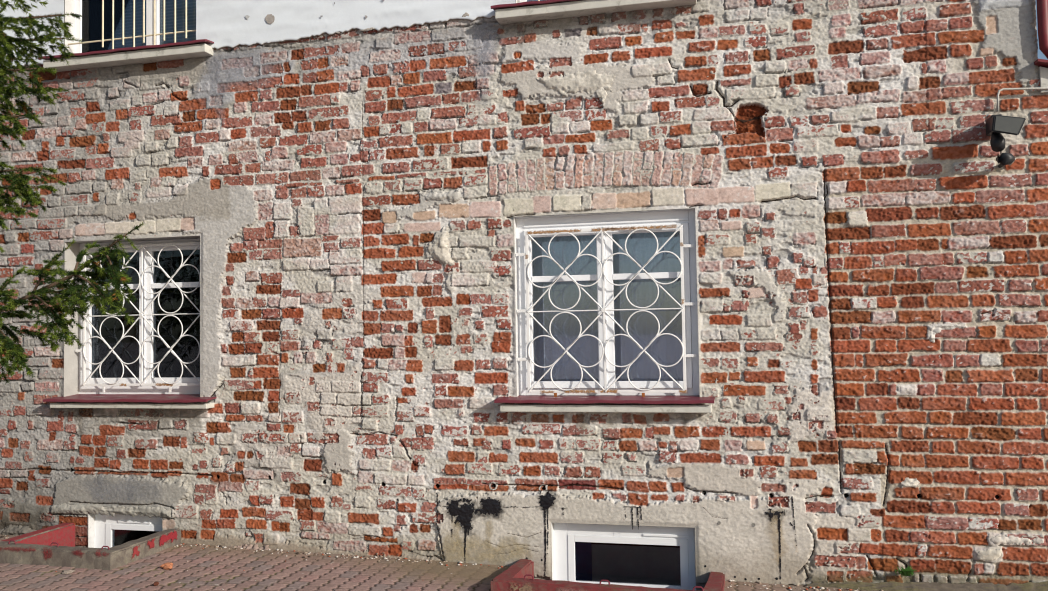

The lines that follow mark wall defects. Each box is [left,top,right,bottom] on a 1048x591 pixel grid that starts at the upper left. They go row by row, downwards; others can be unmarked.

crack [669,60,738,137]
spalling [734,104,769,136]
crack [762,173,842,499]
crack [882,444,890,504]